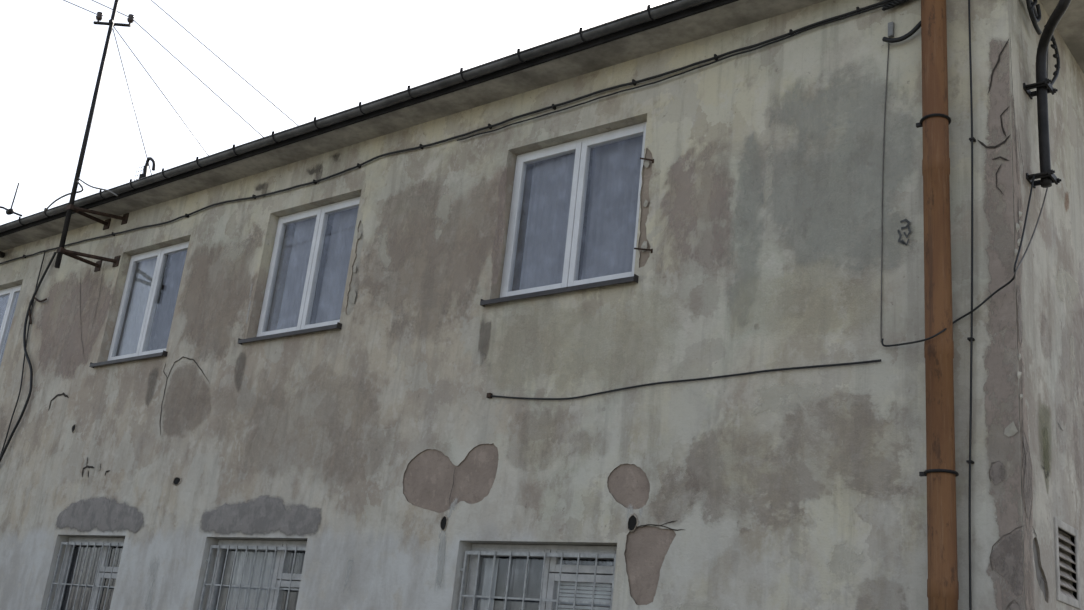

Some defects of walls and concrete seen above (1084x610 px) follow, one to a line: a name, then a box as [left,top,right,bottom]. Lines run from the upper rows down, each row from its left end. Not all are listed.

spalling [978,39,1049,610]
peeling [403,444,499,583]
peeling [607,463,676,605]